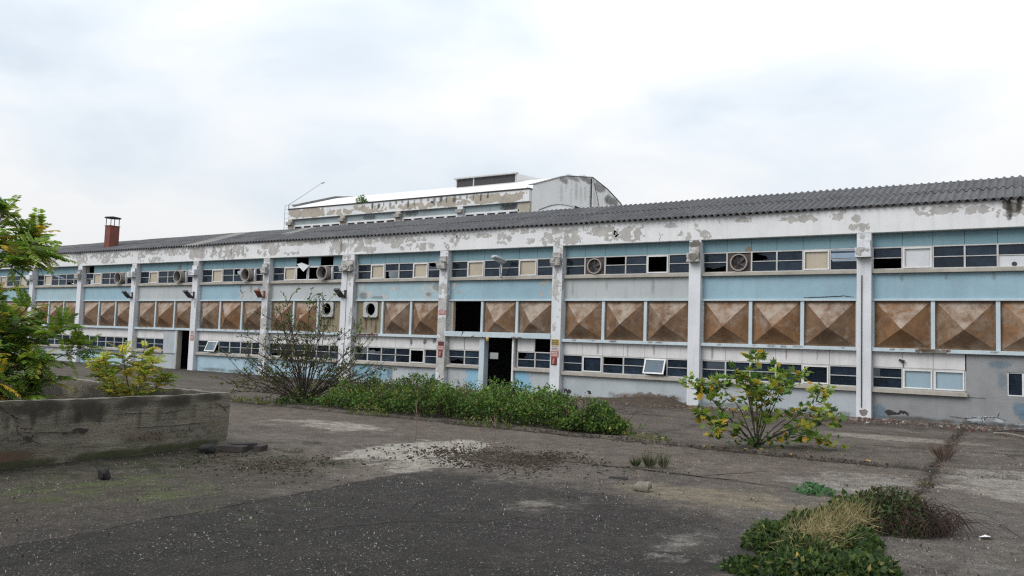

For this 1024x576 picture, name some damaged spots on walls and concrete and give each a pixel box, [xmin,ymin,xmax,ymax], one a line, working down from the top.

peeling [289,191,527,219]
peeling [913,199,1024,220]
peeling [665,222,711,260]
peeling [832,209,870,255]
peeling [73,233,460,368]
peeling [436,269,462,383]
damp [6,379,190,420]